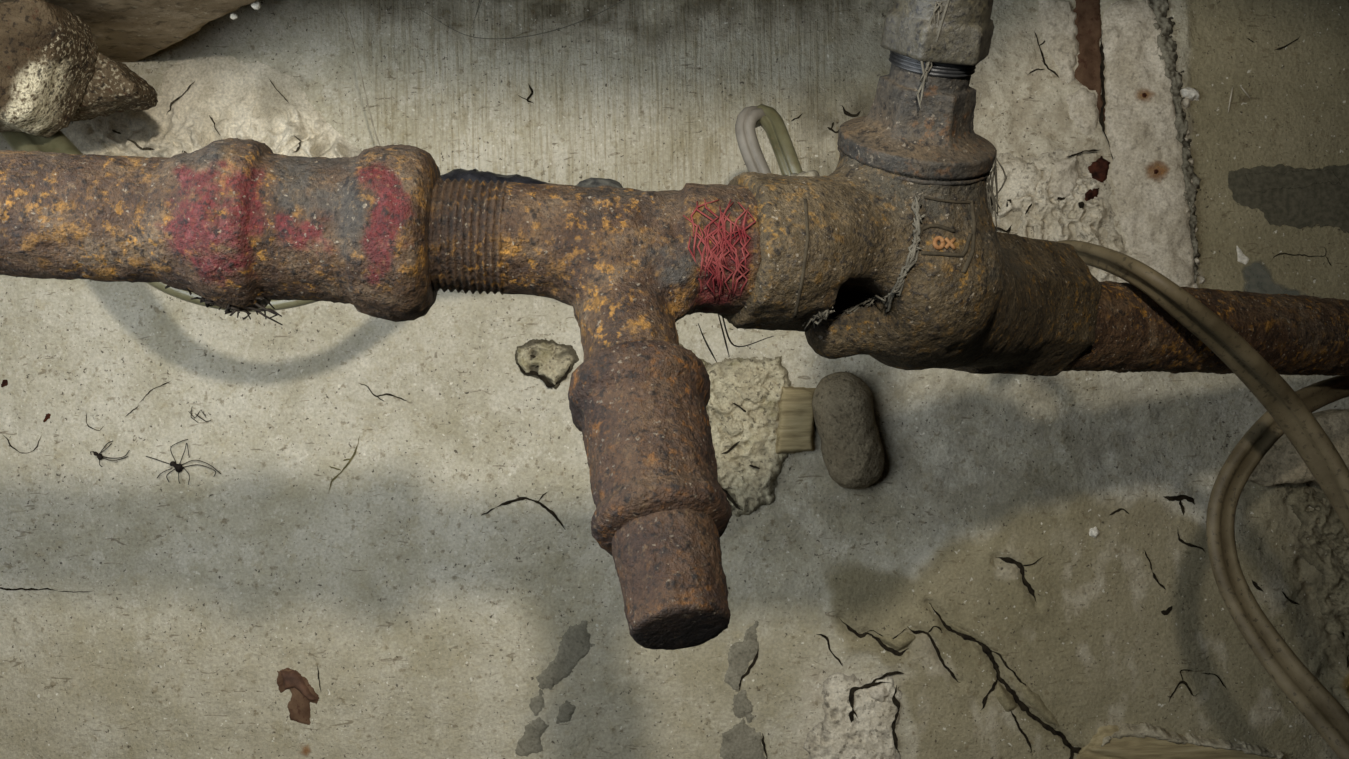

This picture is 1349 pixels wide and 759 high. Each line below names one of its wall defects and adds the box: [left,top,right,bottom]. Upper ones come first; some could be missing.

rust [1148,163,1168,178]
water stain [1228,164,1349,233]
crack [481,492,565,529]
crack [1163,495,1205,552]
crack [996,557,1041,603]
crack [1145,552,1172,615]
peeling [720,621,766,759]
crack [817,603,1082,759]